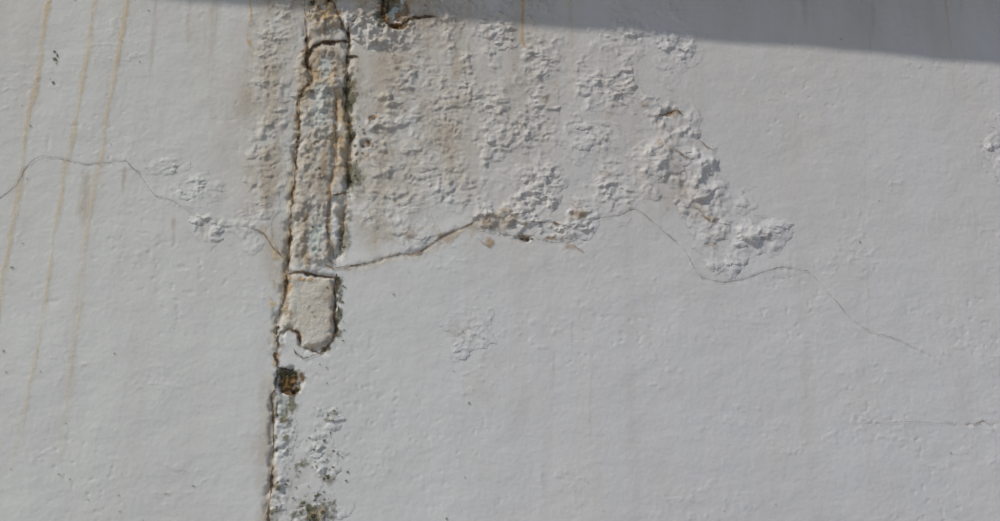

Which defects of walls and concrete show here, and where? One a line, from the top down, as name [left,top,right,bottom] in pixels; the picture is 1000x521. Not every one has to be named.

water stain [310,56,331,127]
water stain [341,55,377,193]
flaking render [296,0,432,52]
crack [0,0,494,521]
water stain [322,277,346,351]
flaking render [265,367,355,521]